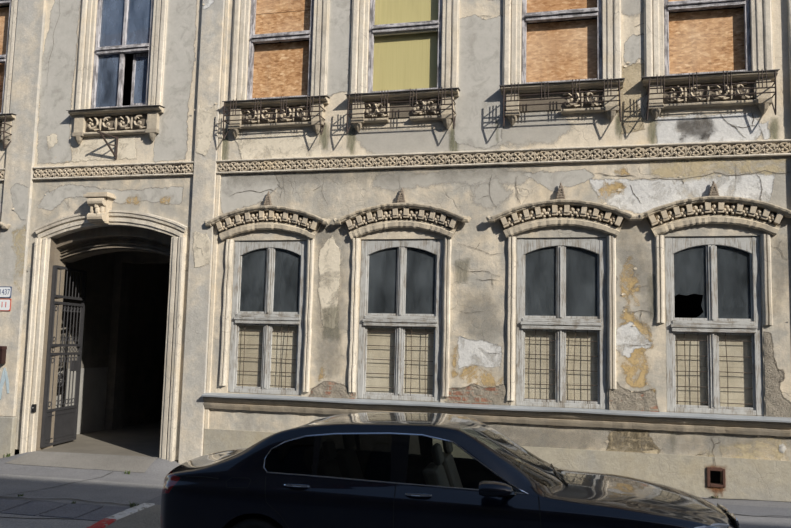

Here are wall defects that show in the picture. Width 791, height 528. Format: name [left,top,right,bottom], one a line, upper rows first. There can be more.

peeling [153,0,218,162]
peeling [373,165,529,209]
peeling [590,157,786,213]
peeling [318,236,341,329]
flaking render [309,368,356,399]
flaking render [444,336,511,405]
flaking render [609,256,659,412]
flaking render [764,332,791,418]